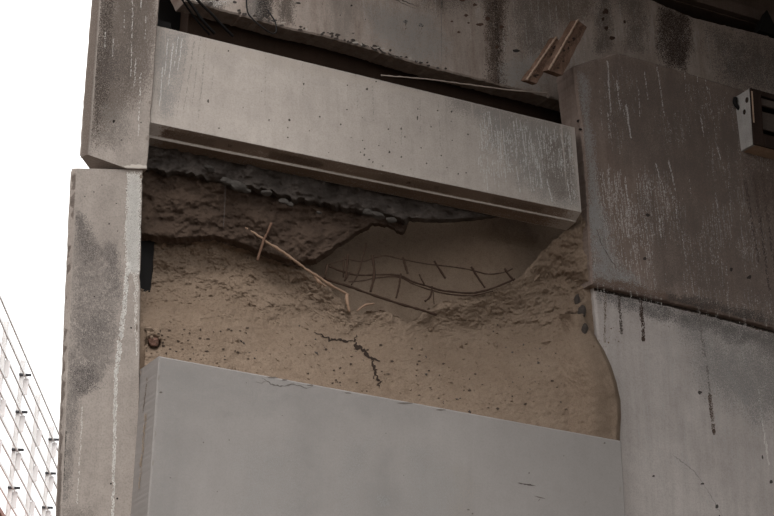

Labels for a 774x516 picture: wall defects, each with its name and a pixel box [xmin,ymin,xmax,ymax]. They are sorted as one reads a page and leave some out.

leakage [56,171,142,516]
spalling [124,135,498,225]
crack [314,332,382,388]
leakage [323,0,774,466]